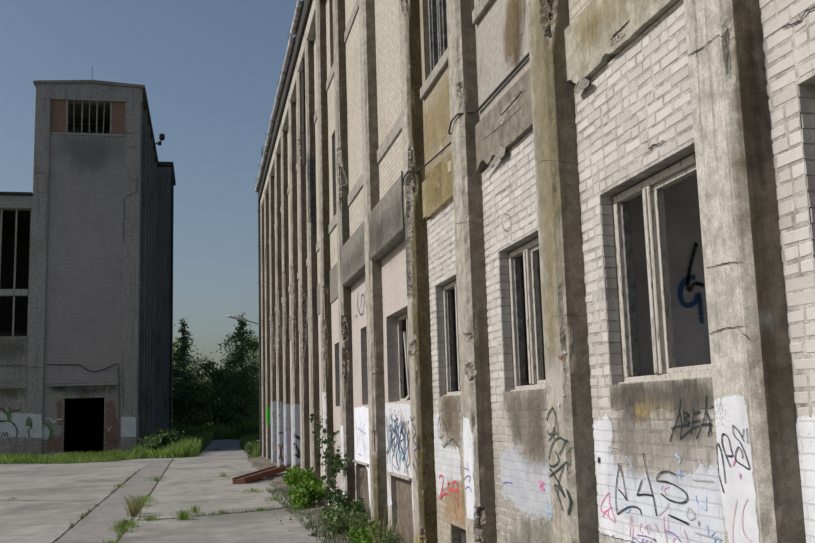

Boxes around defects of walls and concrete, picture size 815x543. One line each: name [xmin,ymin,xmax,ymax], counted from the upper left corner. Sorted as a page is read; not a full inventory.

damp [504,0,524,66]
spalling [540,0,556,37]
crack [781,6,815,28]
crack [689,1,759,134]
damp [504,398,544,457]
spalling [473,507,486,543]